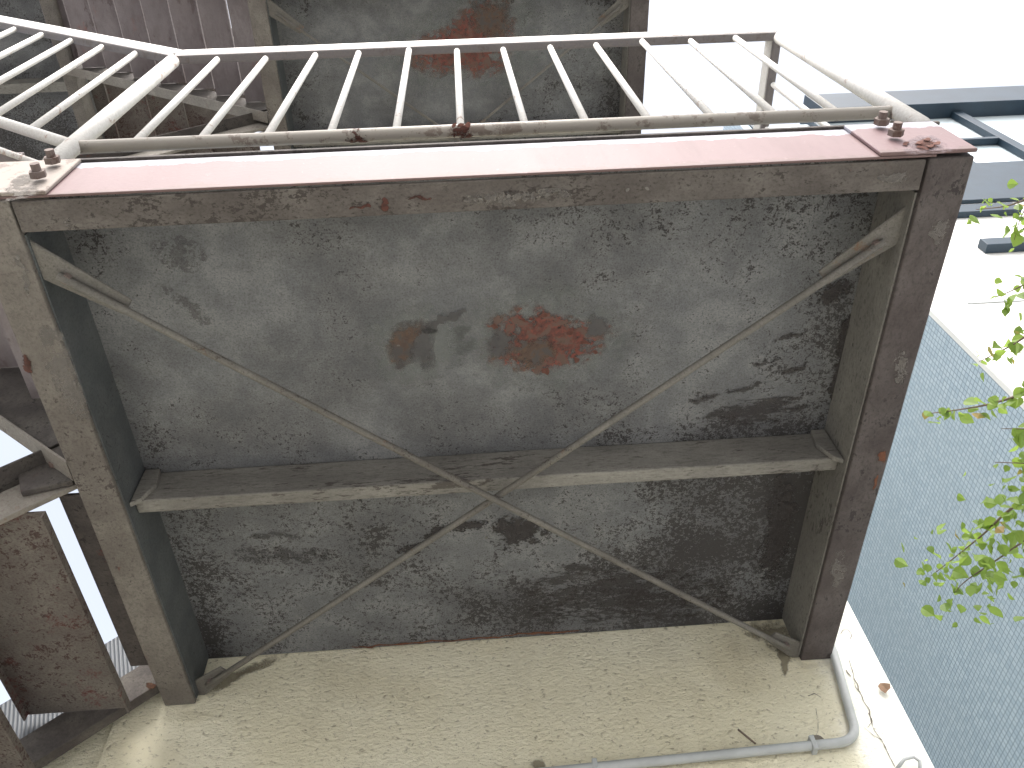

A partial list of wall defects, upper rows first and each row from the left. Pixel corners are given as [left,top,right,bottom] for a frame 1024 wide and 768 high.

rust [401,0,538,41]
rust [383,51,540,90]
rust [451,122,475,138]
rust [903,138,940,150]
rust [371,289,627,387]
crack [840,629,896,768]